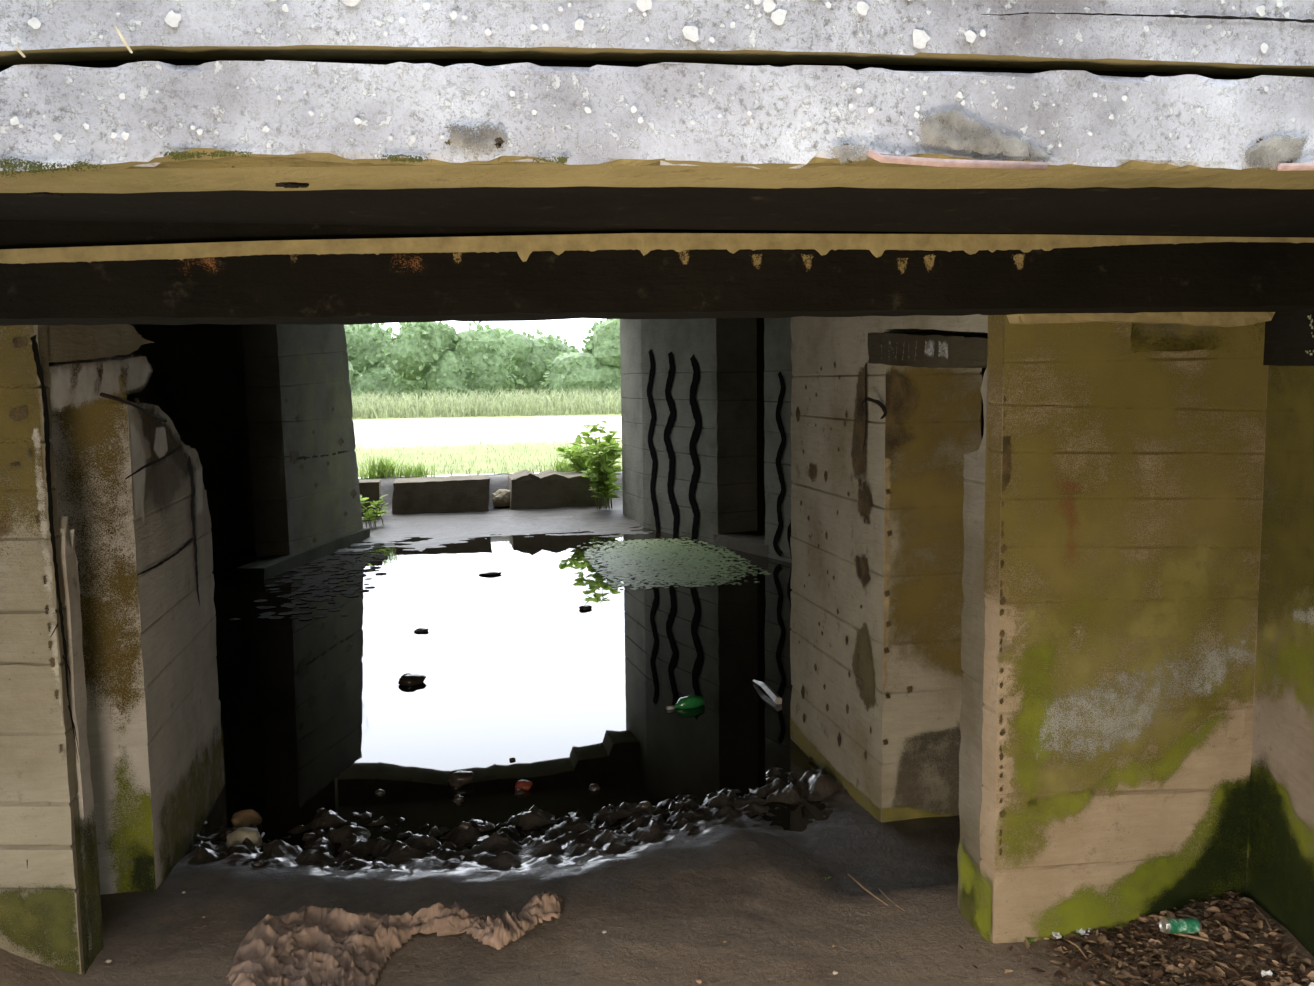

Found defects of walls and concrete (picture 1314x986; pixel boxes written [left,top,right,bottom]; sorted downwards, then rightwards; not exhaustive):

spalling [443,122,510,154]
spalling [827,108,1060,170]
spalling [1242,134,1314,171]
damp [0,325,144,734]
spalling [850,361,924,723]
damp [1028,629,1256,775]
damp [0,883,80,974]